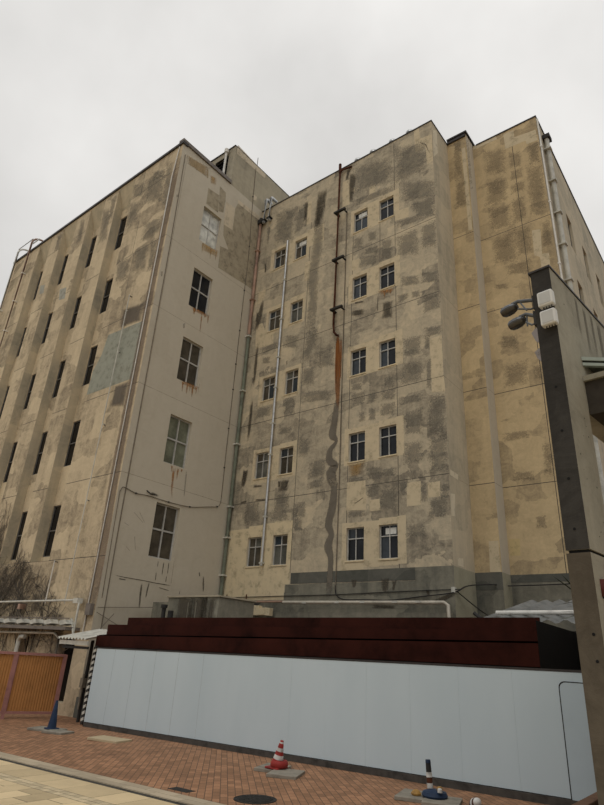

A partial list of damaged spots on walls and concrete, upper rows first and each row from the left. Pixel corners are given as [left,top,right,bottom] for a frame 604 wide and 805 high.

water stain [324,406,338,589]